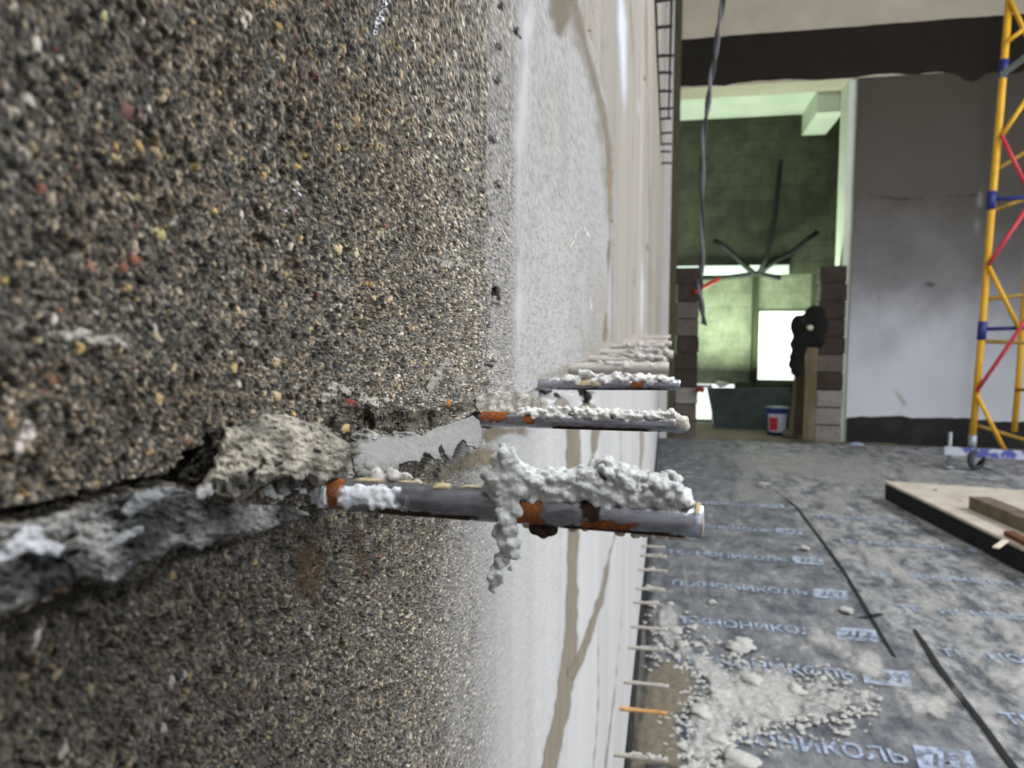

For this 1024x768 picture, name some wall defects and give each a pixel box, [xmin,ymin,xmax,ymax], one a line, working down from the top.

crack [0,435,214,520]
water stain [566,429,599,469]
water stain [542,529,610,768]